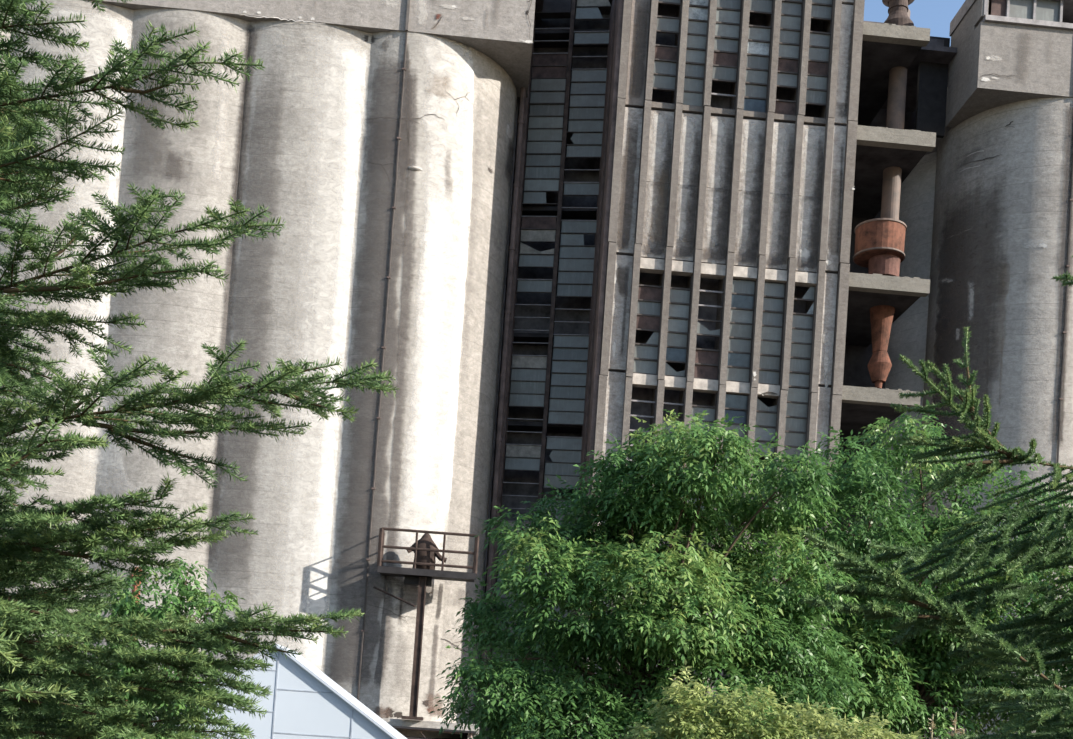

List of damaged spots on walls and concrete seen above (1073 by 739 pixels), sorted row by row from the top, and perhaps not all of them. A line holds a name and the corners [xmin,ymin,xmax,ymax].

damp [208,432,256,564]
damp [220,29,276,379]
damp [330,49,443,704]
damp [618,128,638,248]
damp [645,135,823,268]
damp [929,190,1000,450]